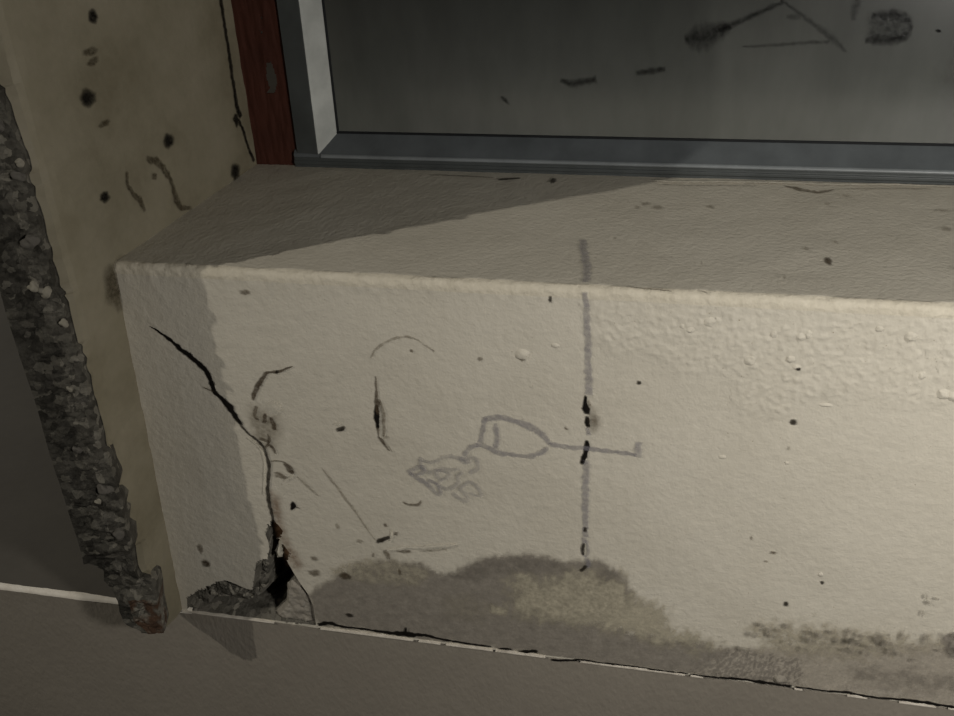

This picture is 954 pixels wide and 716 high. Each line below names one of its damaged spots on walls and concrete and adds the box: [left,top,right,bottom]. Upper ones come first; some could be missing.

spalling [0,86,169,634]
crack [150,326,292,522]
spalling [186,521,316,625]
leakage [310,555,954,706]
crack [317,621,954,708]